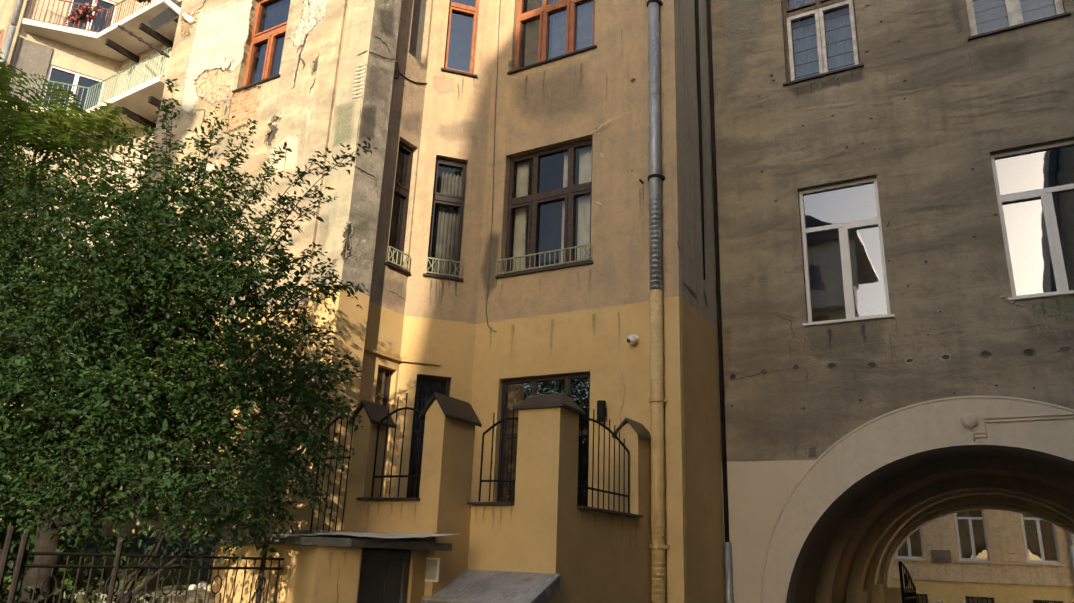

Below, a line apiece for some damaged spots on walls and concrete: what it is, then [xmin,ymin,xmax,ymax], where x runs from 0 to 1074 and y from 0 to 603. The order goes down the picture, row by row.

flaking render [289,0,327,50]
flaking render [180,0,283,150]
flaking render [311,53,319,77]